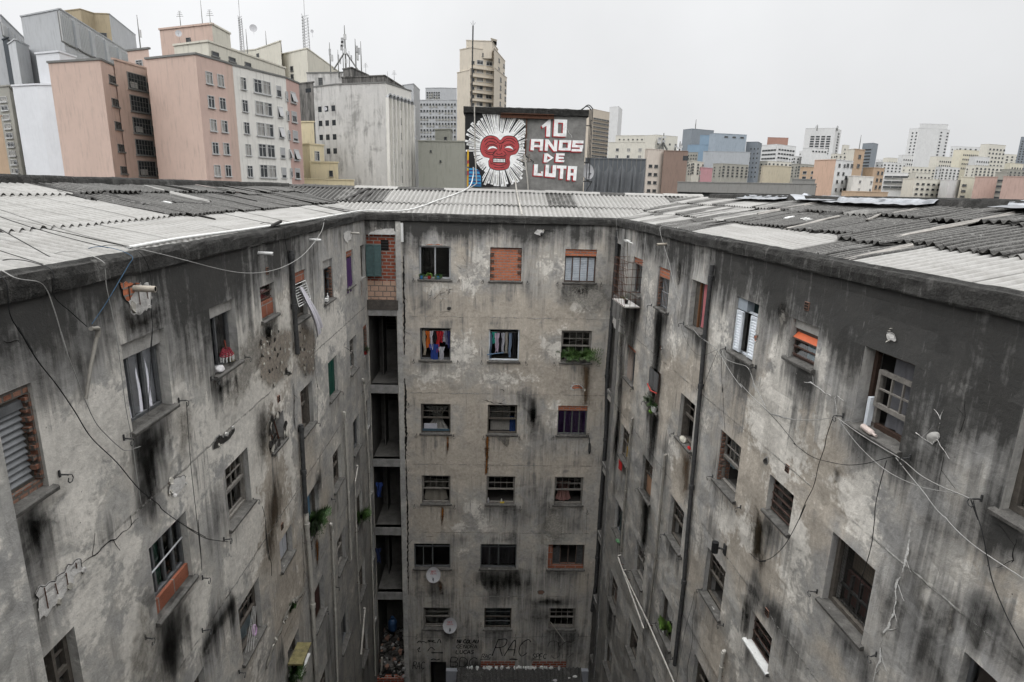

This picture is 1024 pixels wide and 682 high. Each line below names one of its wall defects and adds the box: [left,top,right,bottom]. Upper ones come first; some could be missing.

flaking render [258,328,315,387]
crack [402,256,471,595]
leakage [753,513,762,565]
leakage [163,612,190,672]